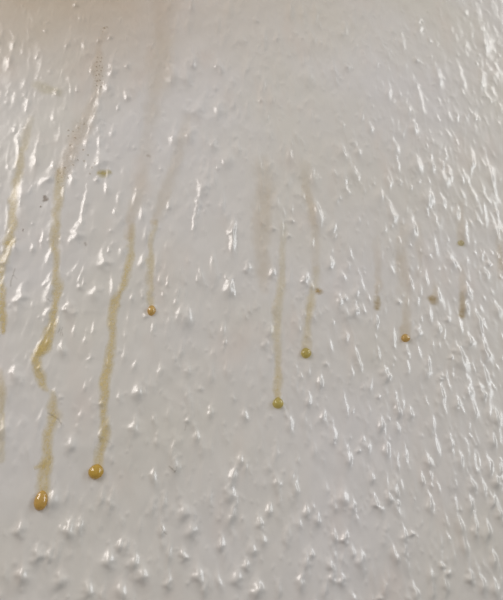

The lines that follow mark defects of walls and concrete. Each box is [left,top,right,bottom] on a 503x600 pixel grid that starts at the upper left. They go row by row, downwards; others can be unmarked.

leakage [33,302,57,385]
leakage [34,490,48,511]